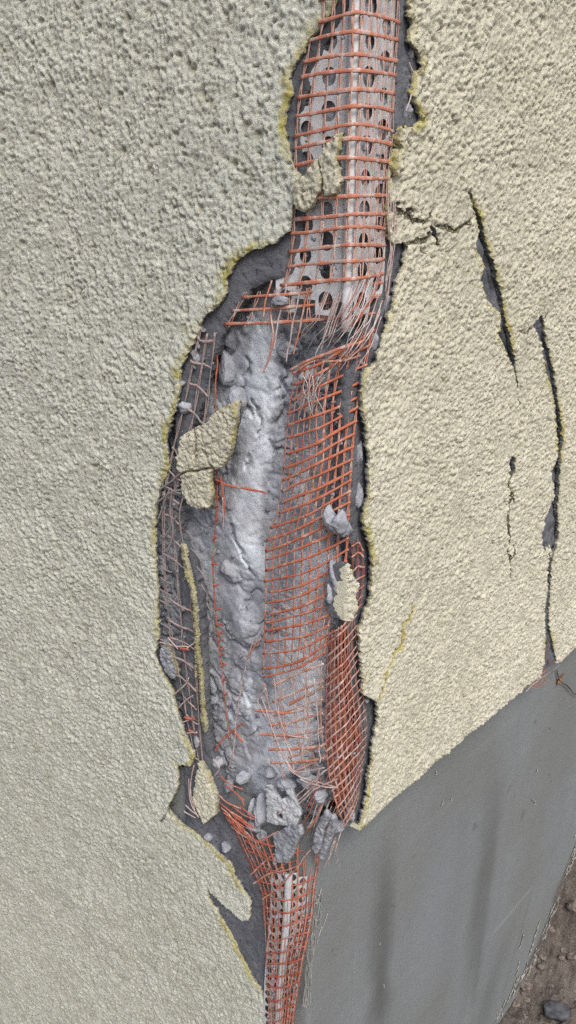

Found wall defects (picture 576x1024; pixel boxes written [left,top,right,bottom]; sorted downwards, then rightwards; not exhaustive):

spalling [153,0,424,1024]
crack [379,610,413,699]
crack [389,192,572,670]